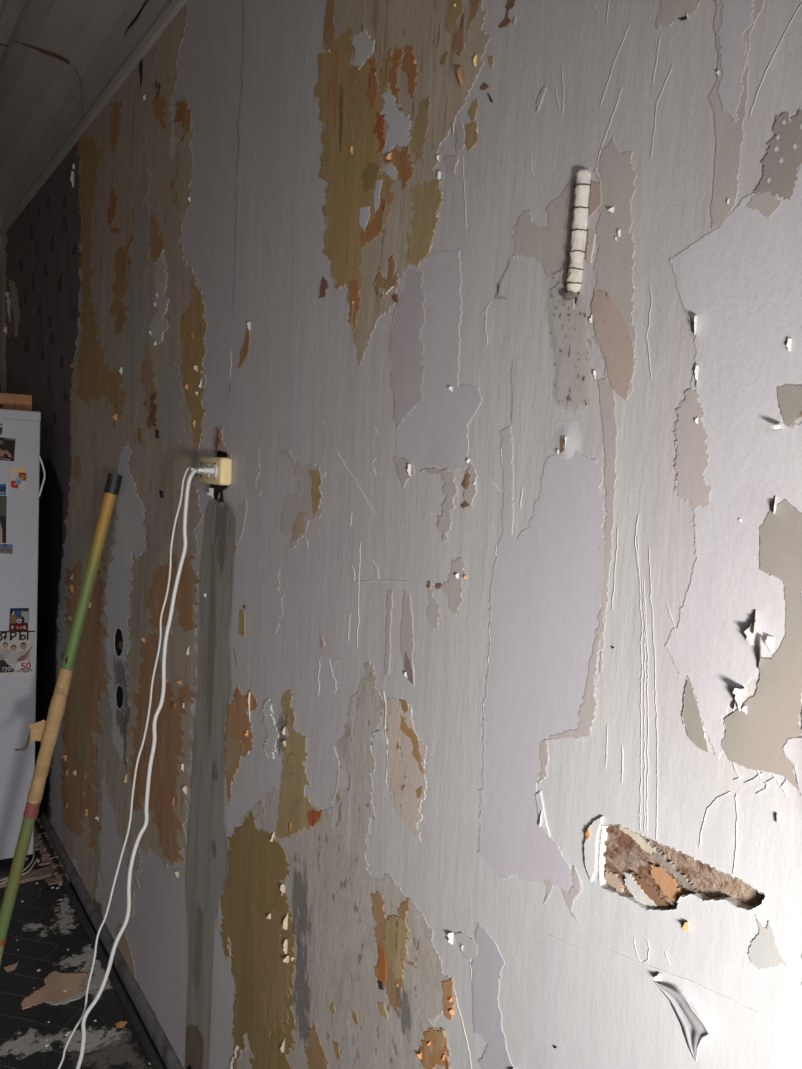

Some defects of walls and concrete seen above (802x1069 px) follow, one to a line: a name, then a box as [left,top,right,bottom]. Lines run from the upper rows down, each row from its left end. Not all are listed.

crack [0,41,83,121]
crack [124,0,148,35]
peeling [314,0,516,365]
peeling [60,2,232,917]
damp [186,500,235,1069]
peeling [220,590,515,1069]
peeling [427,558,467,629]
peeling [721,496,802,796]